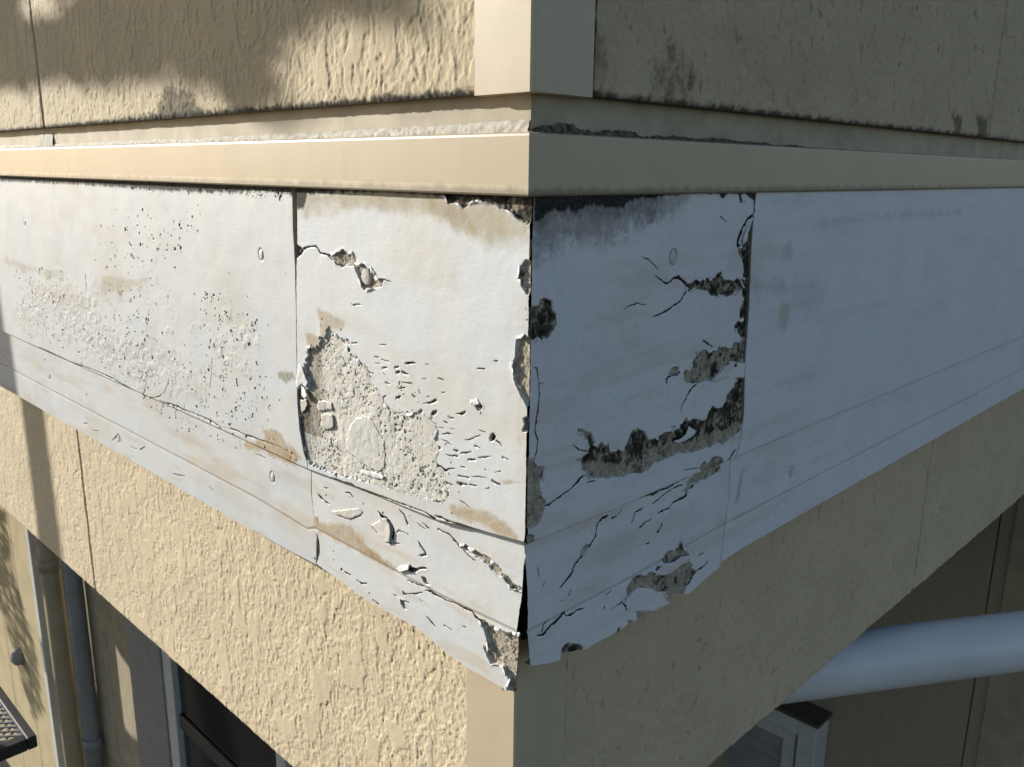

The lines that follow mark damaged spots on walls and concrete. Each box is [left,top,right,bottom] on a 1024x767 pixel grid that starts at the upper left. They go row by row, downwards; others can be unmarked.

damp [534,194,677,221]
spalling [298,246,391,293]
spalling [510,239,556,434]
crack [623,257,745,317]
crack [39,347,283,458]
peeling [283,318,460,504]
spalling [573,317,746,483]
crack [320,342,736,636]
spalling [527,457,547,543]
spalling [396,565,521,692]
spalling [604,533,708,633]